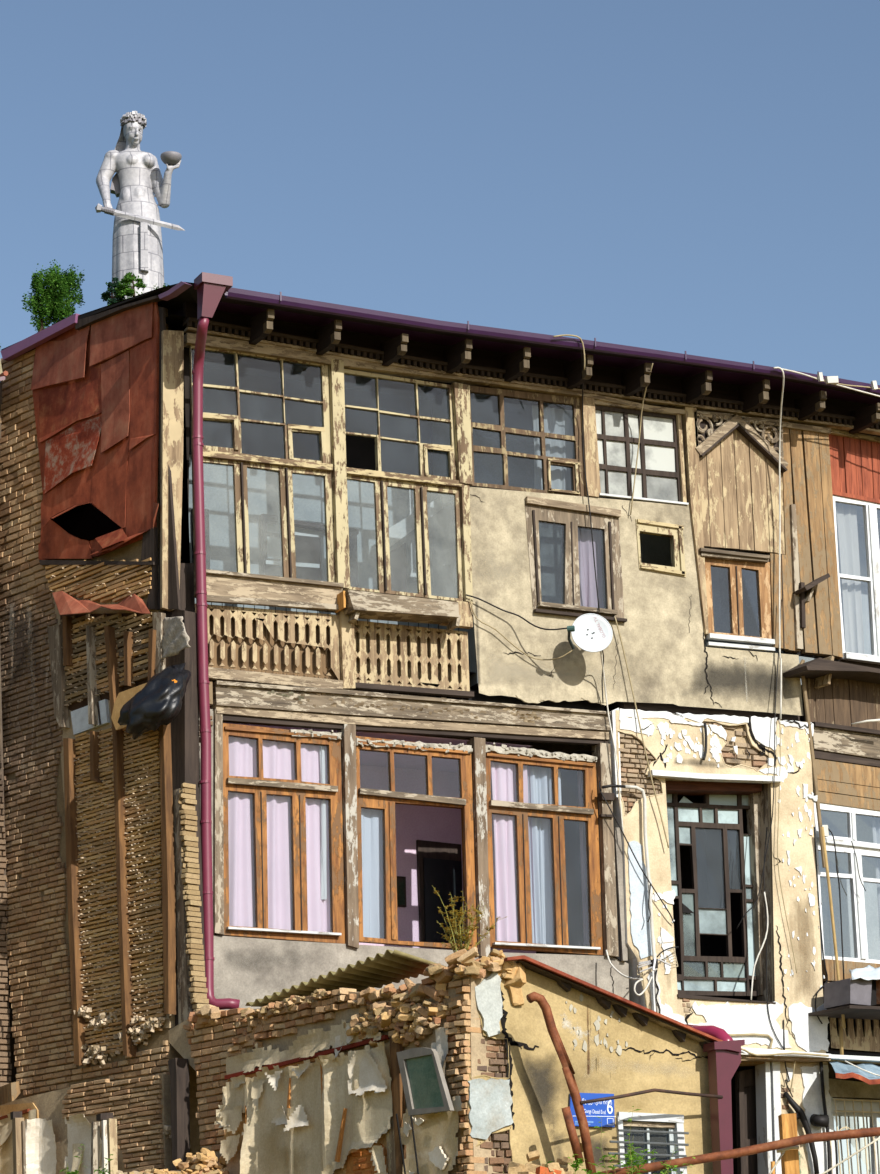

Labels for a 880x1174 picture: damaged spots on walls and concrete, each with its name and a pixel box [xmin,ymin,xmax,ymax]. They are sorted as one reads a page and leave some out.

crack [688,595,758,708]
flaking render [502,692,565,723]
crack [639,712,684,768]
crack [746,715,800,774]
peeling [617,708,831,1174]
spalling [183,1004,224,1031]
spalling [232,989,333,1026]
spalling [343,947,526,1174]
crack [500,986,539,1130]
crack [615,1007,708,1061]
spalling [118,1113,245,1174]
flaking render [333,1133,388,1174]